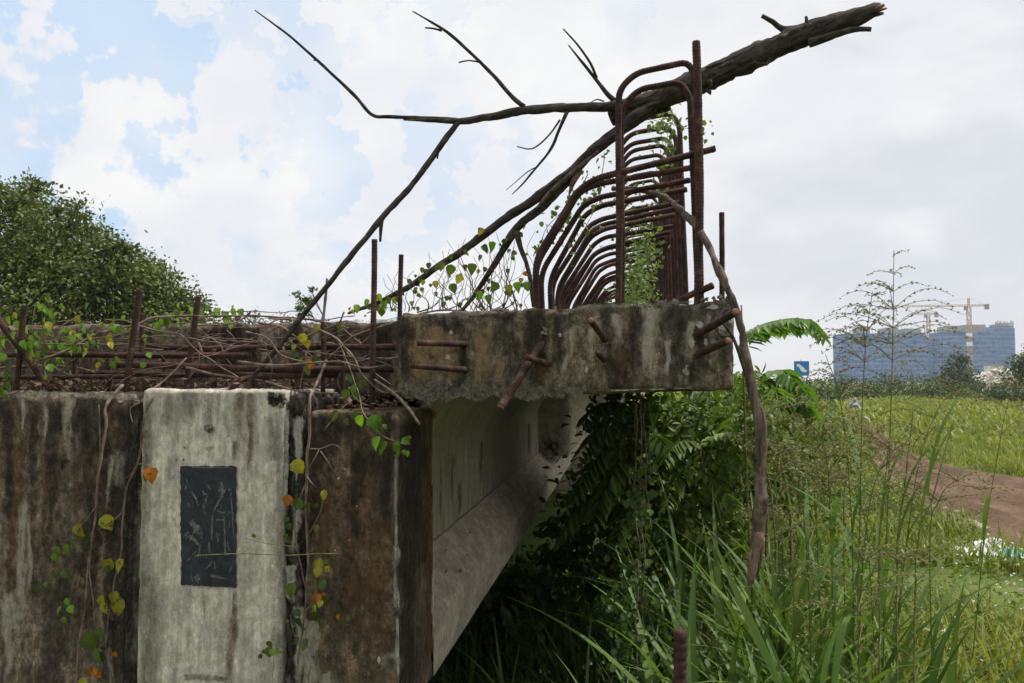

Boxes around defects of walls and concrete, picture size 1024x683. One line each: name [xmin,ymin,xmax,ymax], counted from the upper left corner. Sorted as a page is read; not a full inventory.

damp [204,321,359,381]
damp [375,309,594,384]
spalling [400,347,588,404]
damp [608,306,705,384]
damp [0,396,157,683]
damp [269,408,435,683]